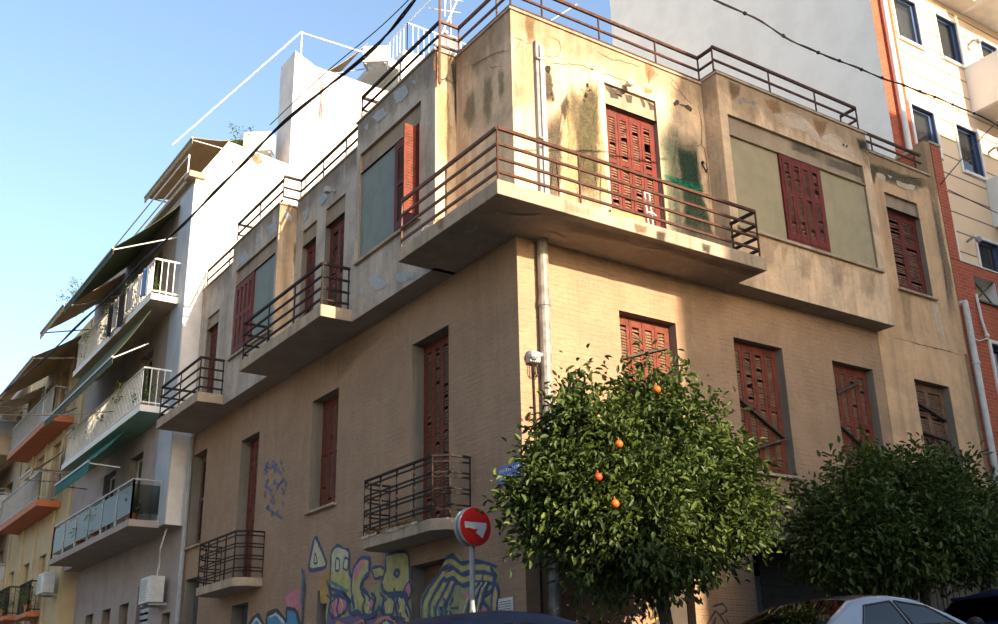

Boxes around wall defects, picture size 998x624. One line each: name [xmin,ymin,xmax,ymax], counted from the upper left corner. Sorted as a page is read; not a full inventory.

crack [436,35,641,89]
leakage [545,72,608,199]
leakage [657,136,712,253]